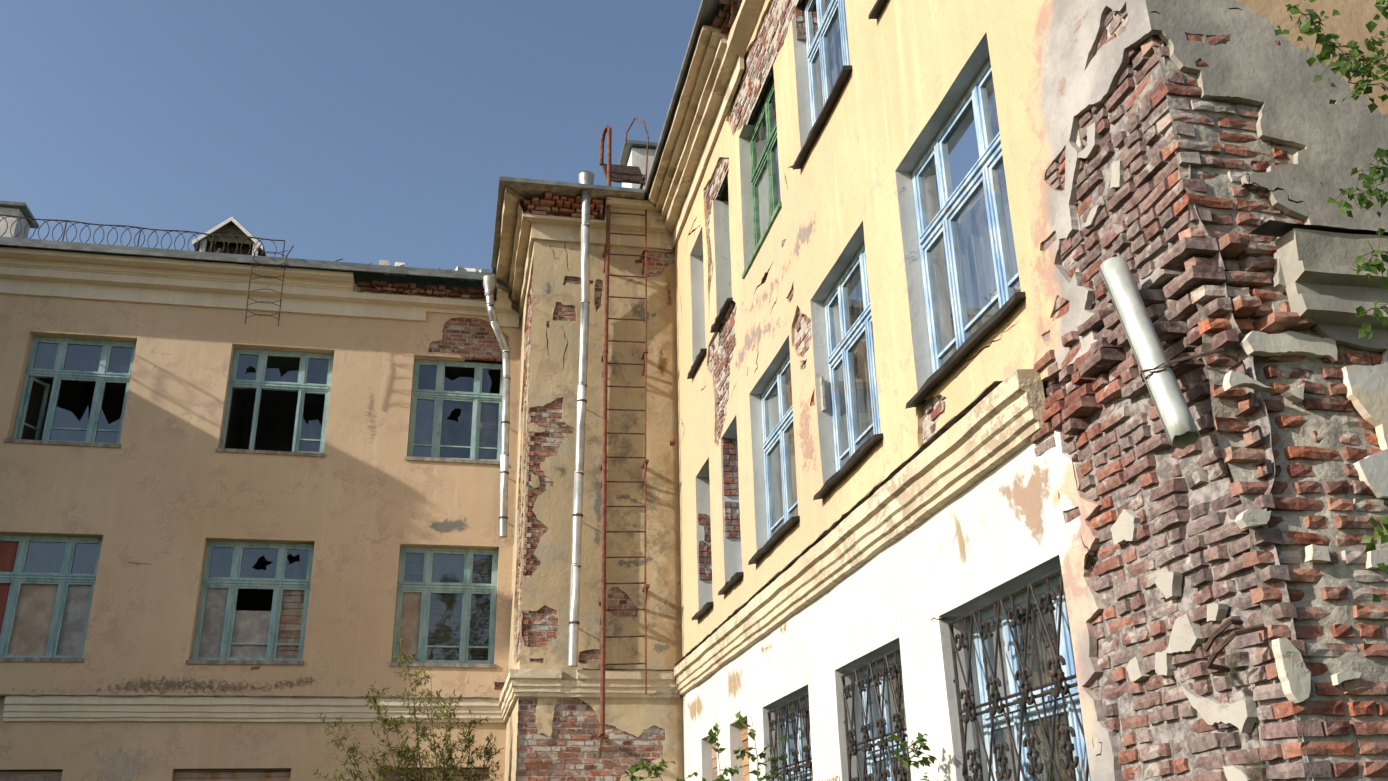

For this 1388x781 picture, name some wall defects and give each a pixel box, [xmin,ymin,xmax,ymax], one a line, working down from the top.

spalling [713,0,742,37]
flaking render [728,0,807,135]
spalling [358,280,495,302]
flaking render [563,277,603,311]
flaking render [1030,8,1388,781]
flaking render [428,272,576,663]
flaking render [698,303,740,580]
flaking render [608,587,638,618]
flaking render [578,649,606,665]
flaking render [516,698,665,781]